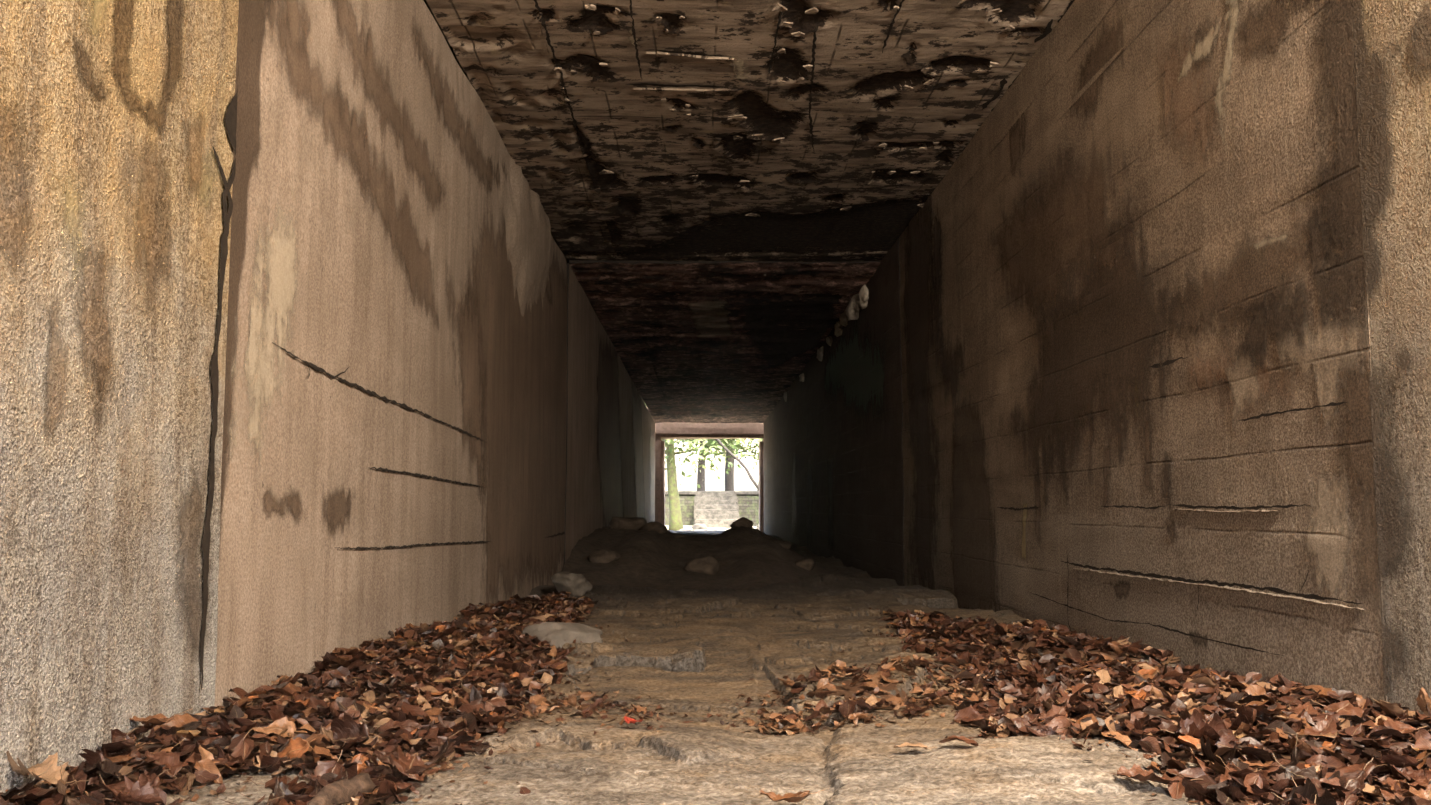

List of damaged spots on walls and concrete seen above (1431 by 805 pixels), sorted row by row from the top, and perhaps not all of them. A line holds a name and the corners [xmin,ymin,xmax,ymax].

damp [75,0,184,133]
crack [534,0,738,130]
spalling [955,0,1045,37]
damp [46,248,112,435]
crack [200,65,239,690]
crack [272,342,488,443]
damp [220,0,567,603]
damp [997,0,1431,560]
crack [338,541,490,550]
crack [1032,556,1365,656]
crack [1101,504,1308,514]
damp [1342,350,1412,699]